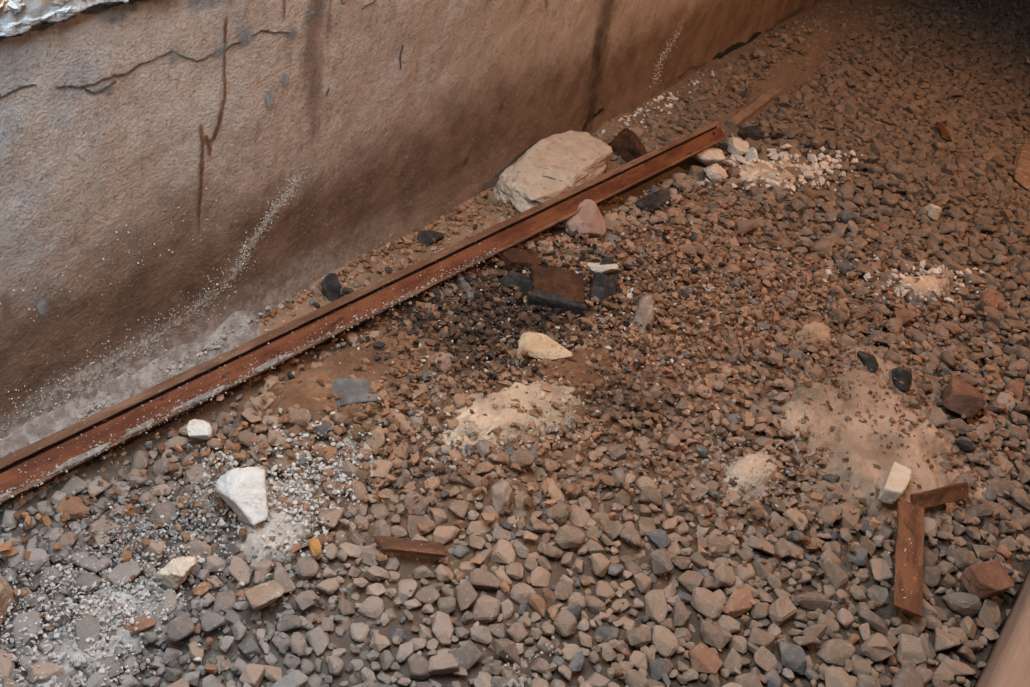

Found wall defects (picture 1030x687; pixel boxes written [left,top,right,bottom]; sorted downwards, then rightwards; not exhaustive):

spalling [0,0,68,16]
crack [0,0,130,37]
peeling [105,0,138,21]
crack [1,29,291,98]
rust [198,17,228,228]
water stain [0,163,308,440]